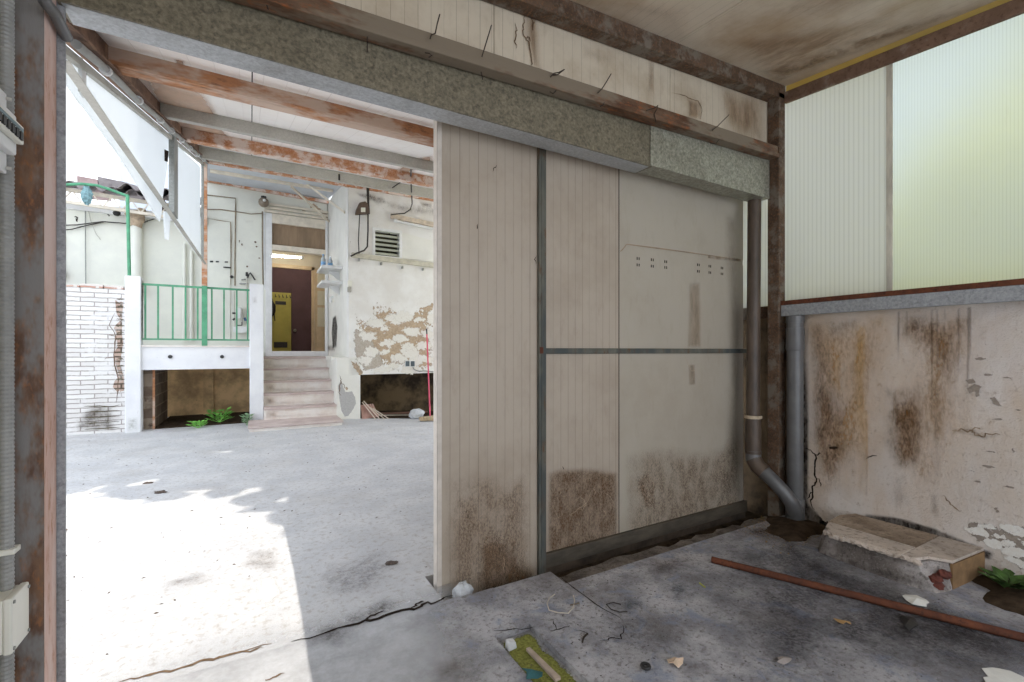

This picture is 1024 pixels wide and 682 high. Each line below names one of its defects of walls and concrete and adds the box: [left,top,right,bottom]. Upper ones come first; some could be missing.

spalling [113,298,124,392]
peeling [351,303,433,375]
peeling [338,382,356,416]
crack [807,448,821,508]
water stain [804,372,828,526]
water stain [894,402,919,462]
crack [952,427,1000,437]
peeling [964,507,1024,570]